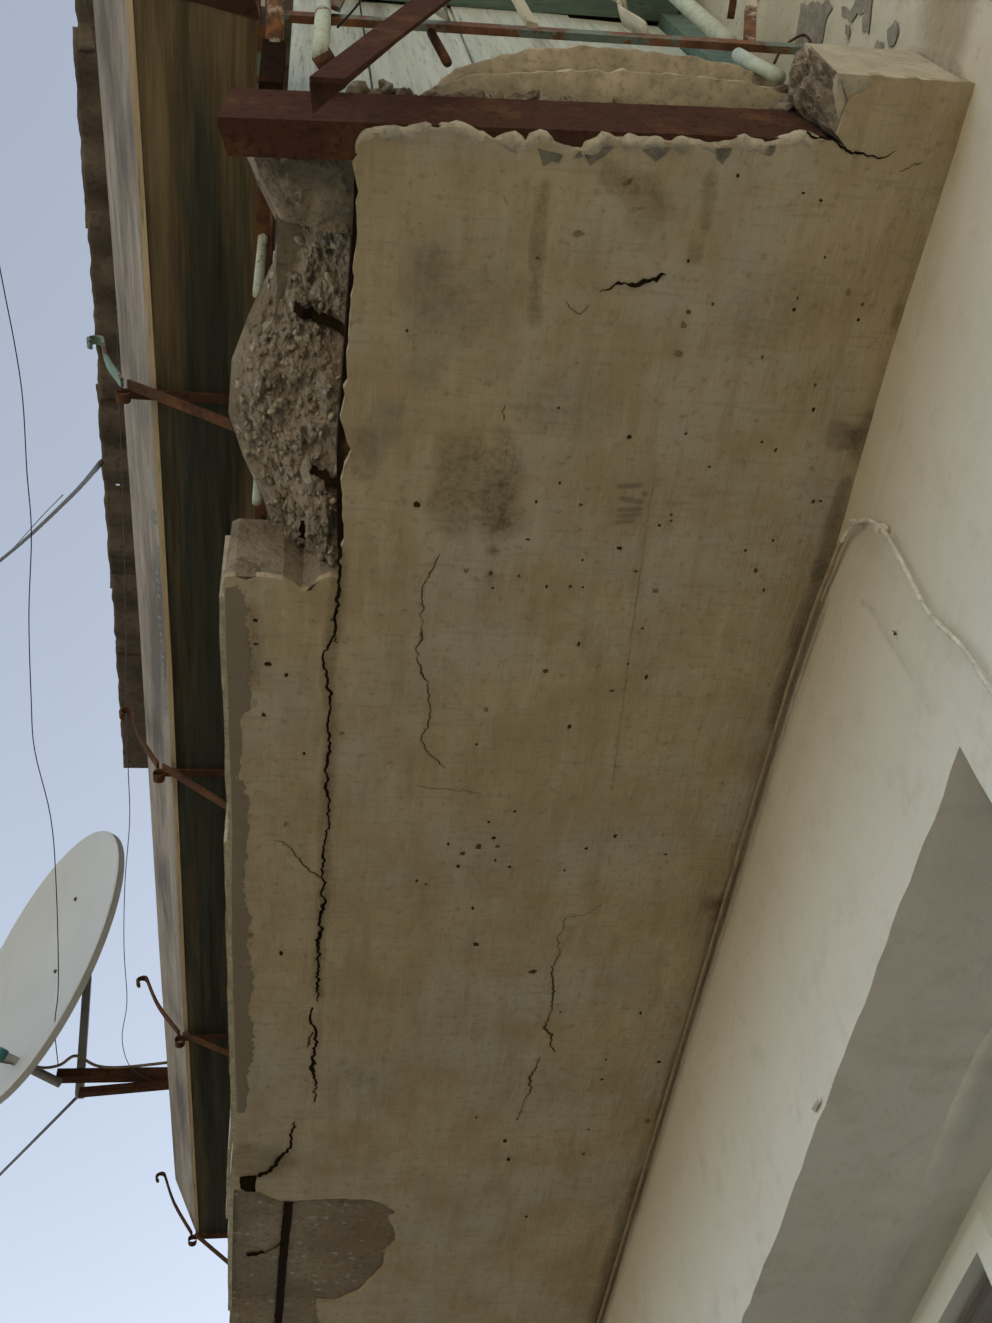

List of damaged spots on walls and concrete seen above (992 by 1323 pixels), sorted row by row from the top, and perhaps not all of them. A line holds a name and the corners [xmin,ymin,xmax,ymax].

crack [768,46,922,172]
peeling [795,0,898,49]
spalling [228,120,825,566]
crack [415,554,481,794]
crack [239,545,342,1192]
crack [517,906,600,1120]
spalling [231,1189,395,1323]